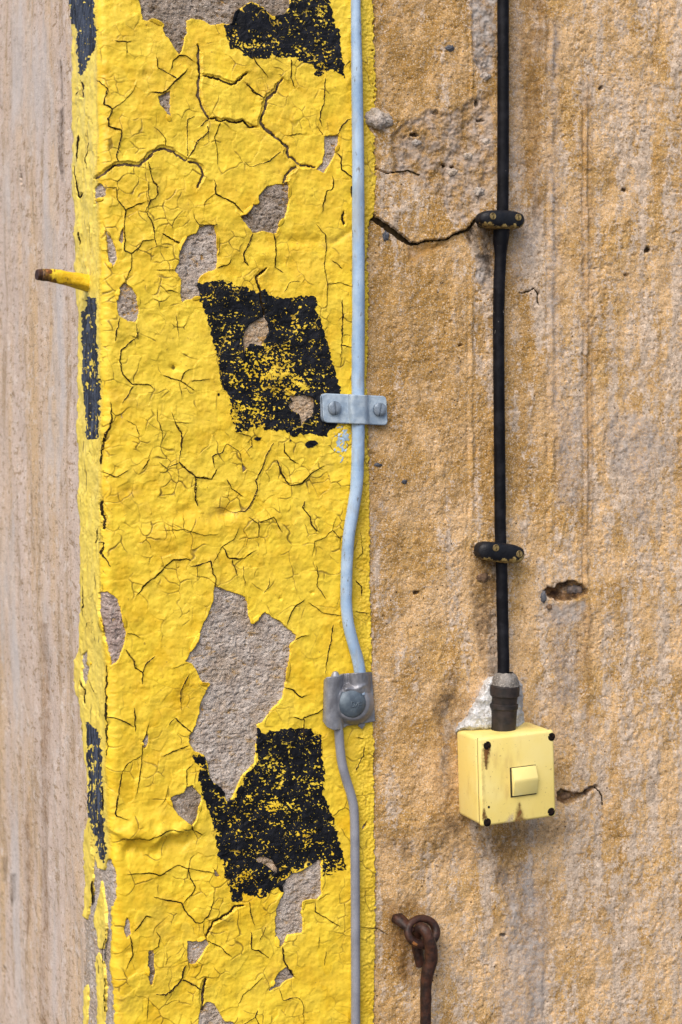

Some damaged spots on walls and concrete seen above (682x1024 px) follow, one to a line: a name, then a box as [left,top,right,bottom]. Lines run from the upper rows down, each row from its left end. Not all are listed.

peeling [139,0,290,54]
peeling [175,226,220,302]
crack [74,45,420,368]
peeling [240,183,292,234]
crack [370,216,475,246]
crack [95,501,111,567]
crack [99,318,369,673]
peeling [98,592,127,665]
crack [80,633,202,840]
peeling [186,586,296,801]
crack [102,865,304,1024]
peeling [256,856,321,948]